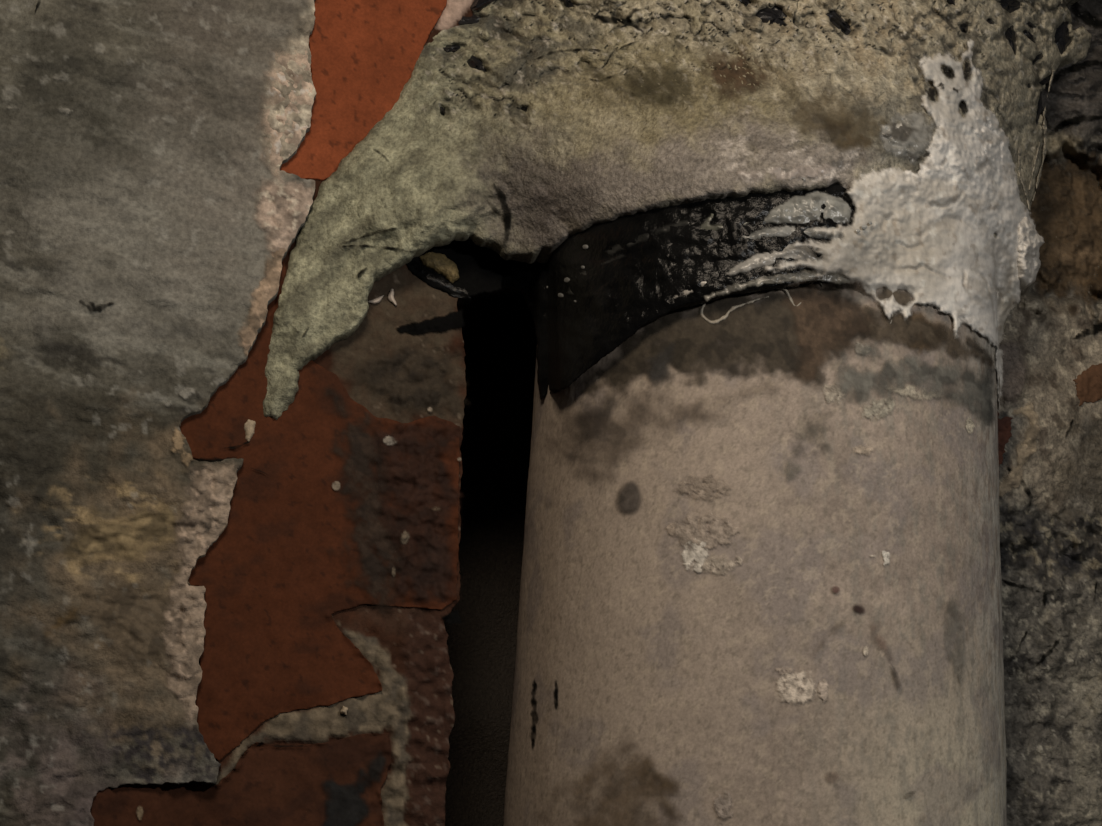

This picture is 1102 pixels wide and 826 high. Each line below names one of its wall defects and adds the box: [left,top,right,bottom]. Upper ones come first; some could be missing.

flaking render [77,0,460,826]
damp [572,40,1045,475]